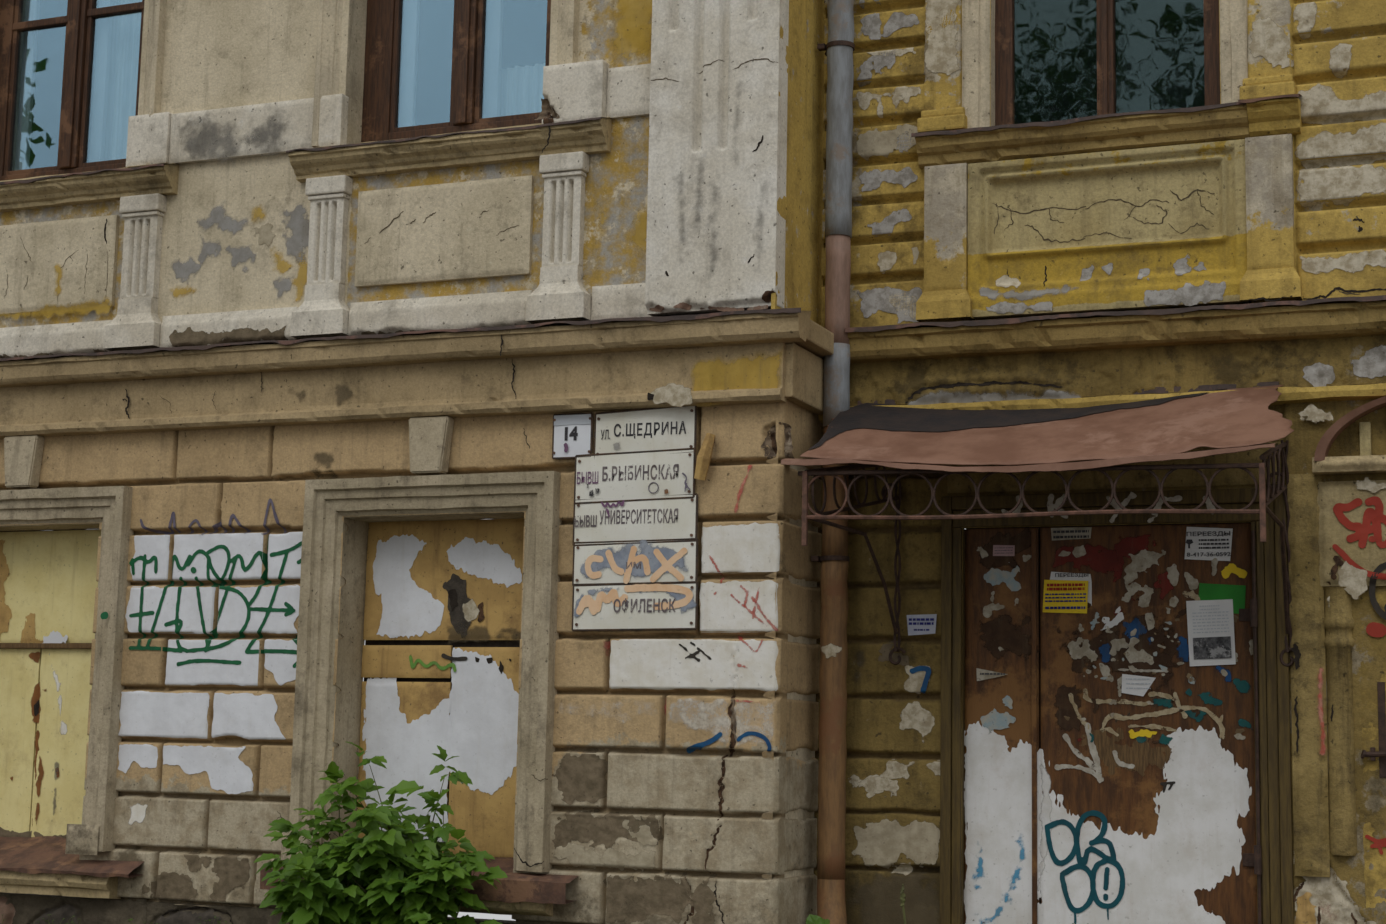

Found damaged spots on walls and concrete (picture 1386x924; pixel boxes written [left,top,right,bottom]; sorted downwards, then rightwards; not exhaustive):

peeling [856,0,961,192]
peeling [1295,43,1386,208]
peeling [172,205,310,301]
peeling [979,263,1113,314]
crack [992,189,1215,286]
peeling [1137,255,1226,306]
peeling [443,573,485,638]
corrosion [31,682,59,825]
crack [684,675,738,924]
peeling [848,759,940,798]
peeling [851,818,940,876]
flaking render [1294,867,1376,924]